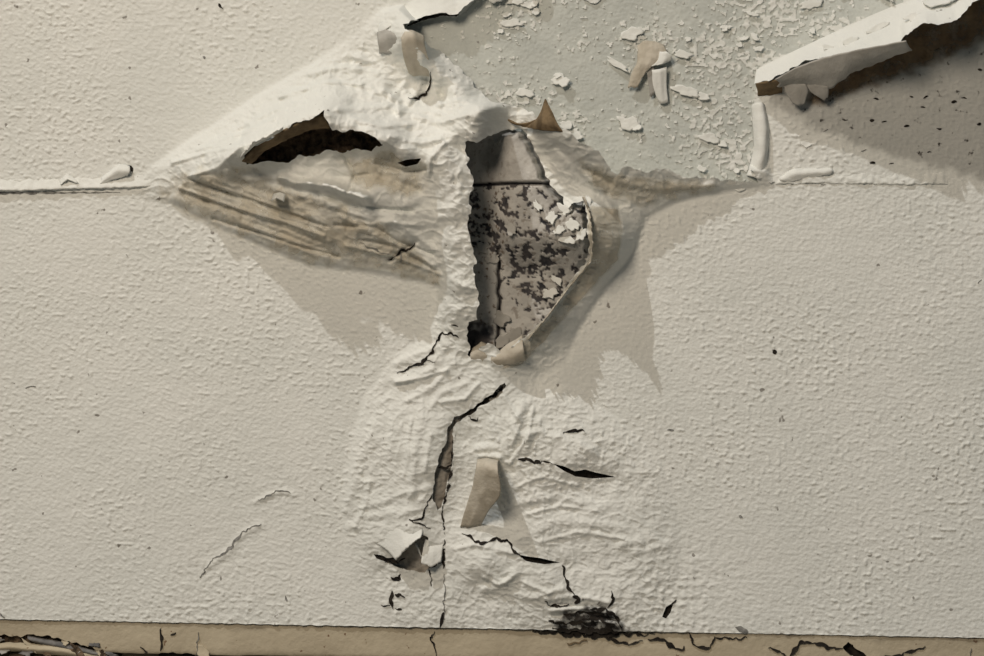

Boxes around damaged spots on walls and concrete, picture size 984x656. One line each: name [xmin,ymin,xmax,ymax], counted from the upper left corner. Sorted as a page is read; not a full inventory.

peeling [404,0,908,192]
water stain [181,179,256,231]
water stain [269,192,402,258]
spalling [465,128,592,357]
crack [397,324,459,373]
crack [518,457,614,478]
crack [409,383,575,656]
crack [375,555,405,564]
water stain [545,591,627,635]
spalling [0,634,118,656]